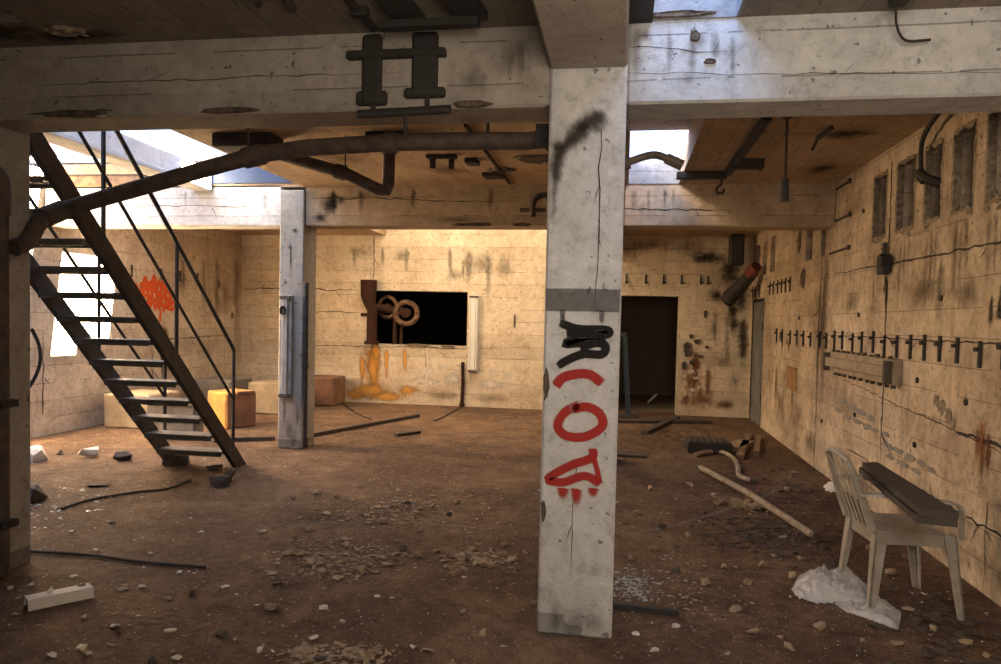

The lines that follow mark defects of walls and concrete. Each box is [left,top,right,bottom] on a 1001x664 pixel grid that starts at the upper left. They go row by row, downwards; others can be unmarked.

rust [348,345,417,401]
spalling [682,334,709,392]
crack [843,380,1001,462]
crack [922,484,1001,575]